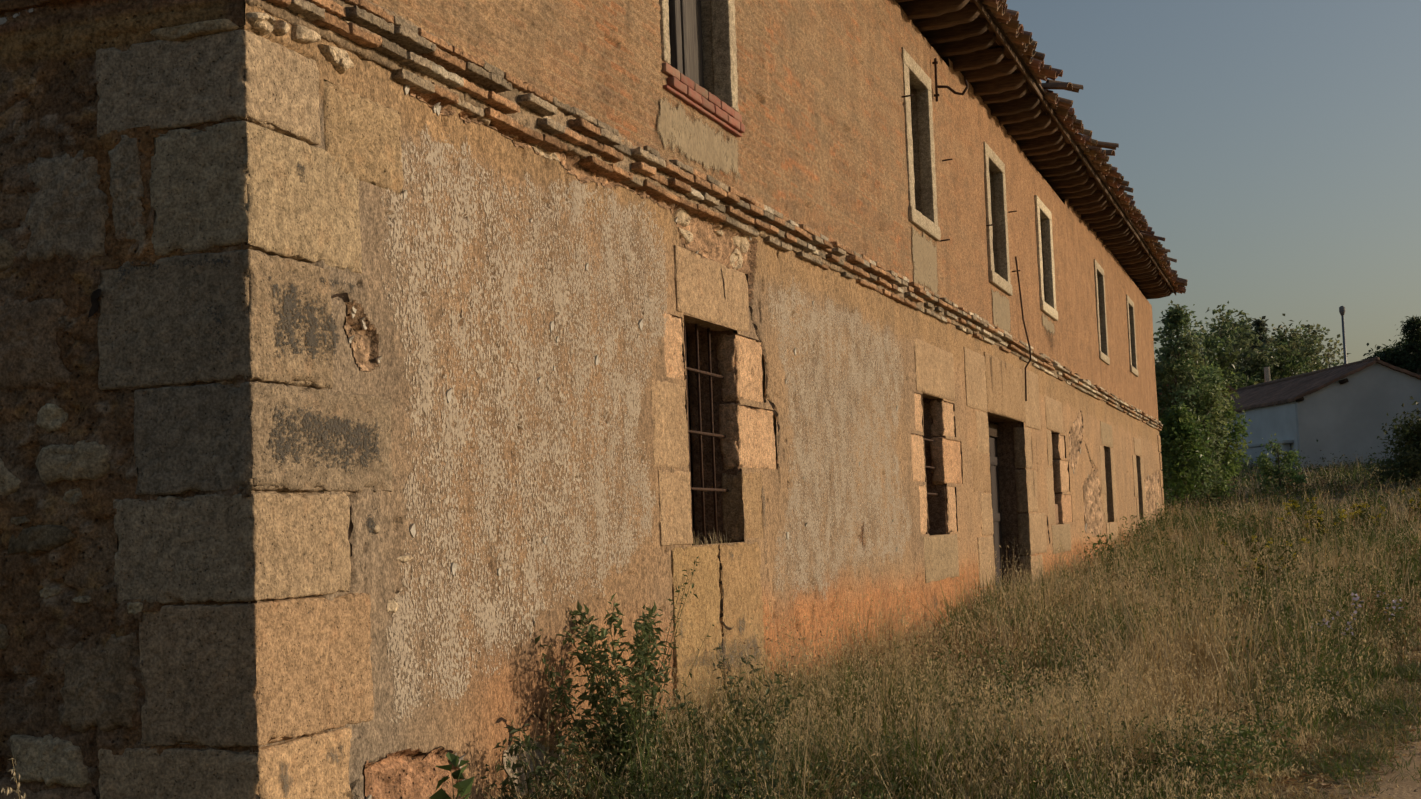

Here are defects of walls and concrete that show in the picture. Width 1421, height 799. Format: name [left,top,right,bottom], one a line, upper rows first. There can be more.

flaking render [344,300,382,372]
peeling [380,84,912,733]
flaking render [1083,468,1104,537]
flaking render [362,748,467,799]